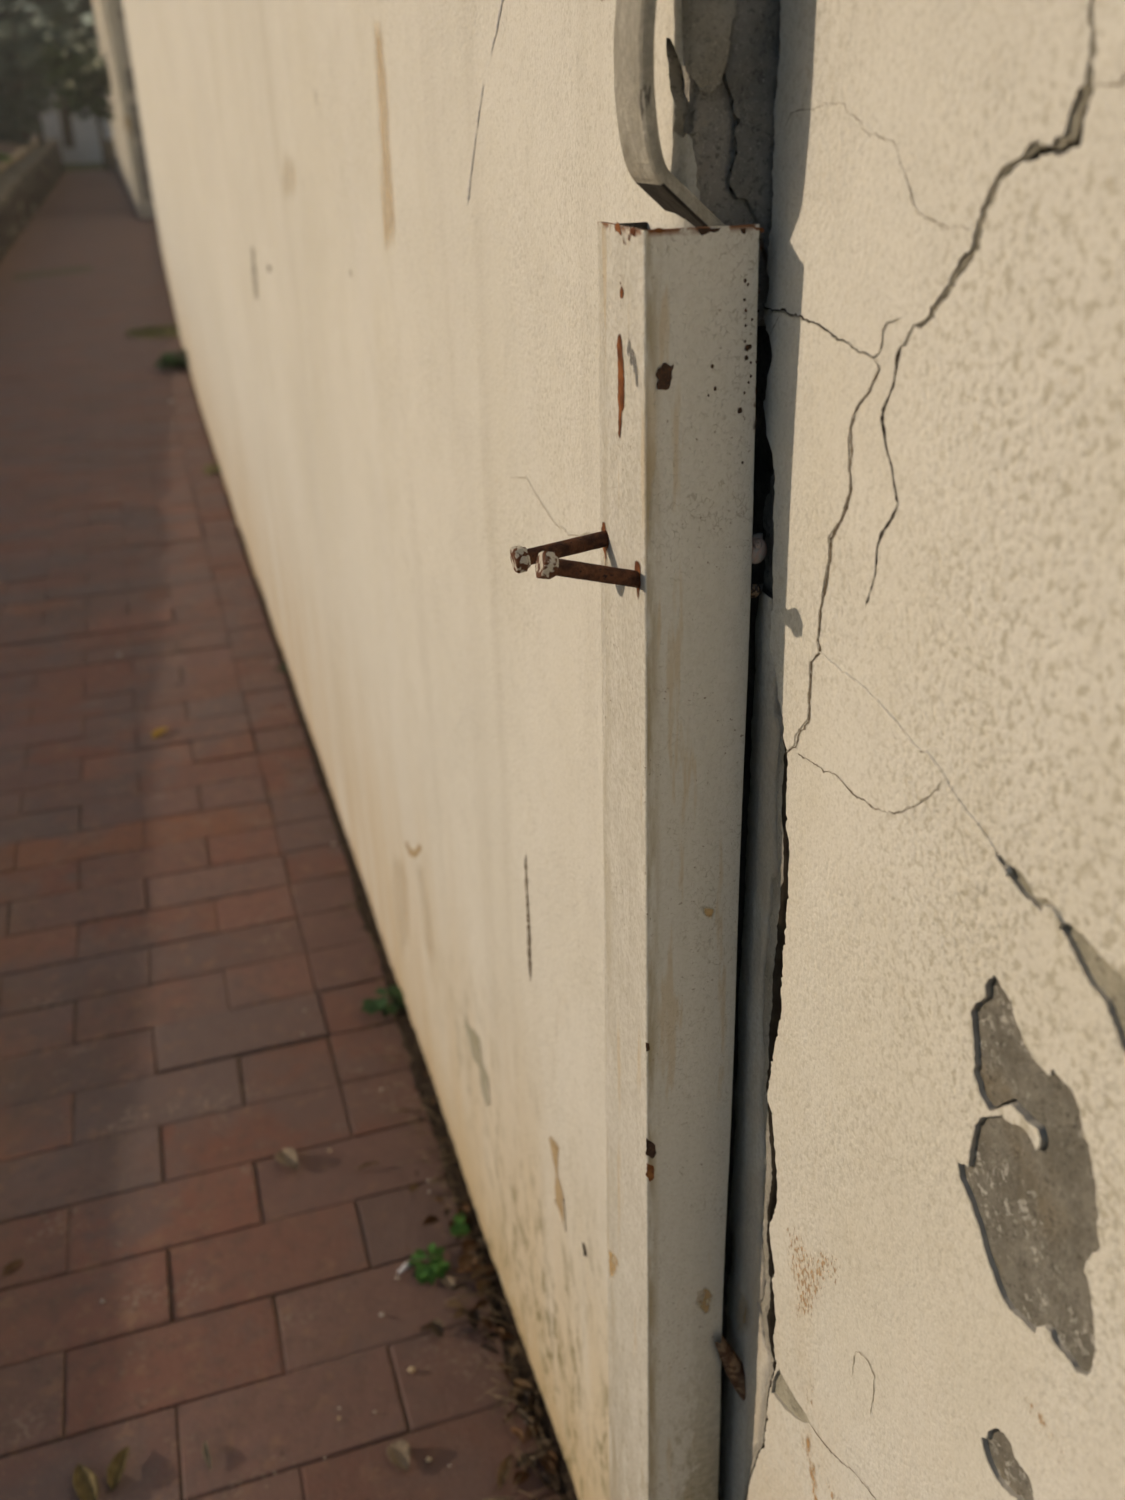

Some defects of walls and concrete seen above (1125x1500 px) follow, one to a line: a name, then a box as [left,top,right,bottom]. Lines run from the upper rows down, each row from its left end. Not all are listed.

crack [467,0,503,206]
corrosion [615,222,666,244]
spalling [679,0,781,326]
corrosion [656,362,674,390]
corrosion [738,279,760,414]
crack [744,0,1125,1500]
peeling [995,854,1125,1054]
peeling [957,977,1100,1373]
peeling [981,1428,1034,1500]